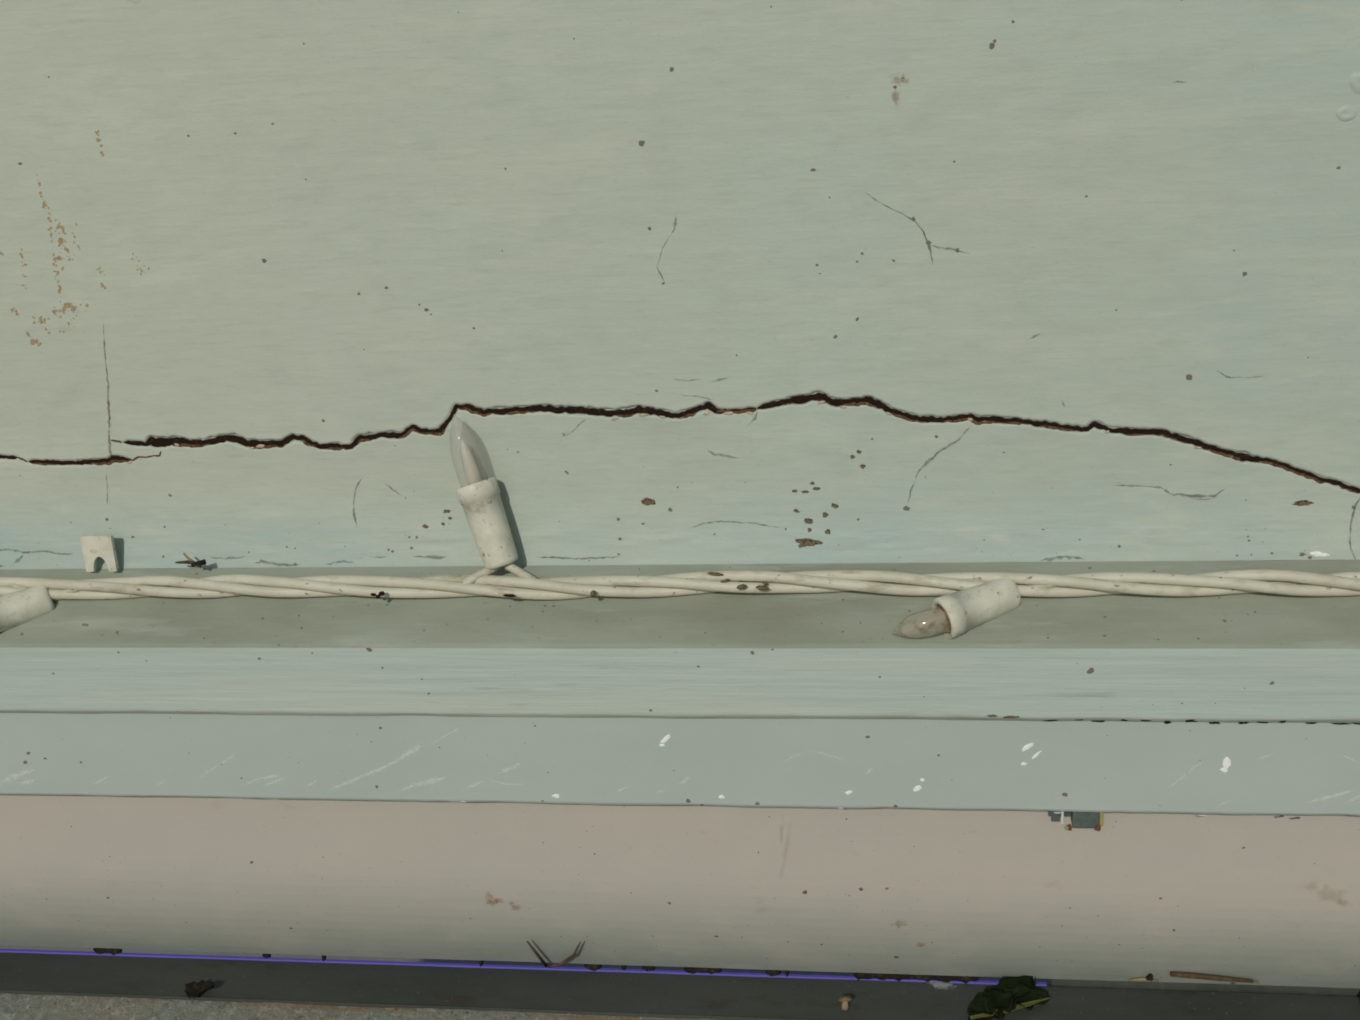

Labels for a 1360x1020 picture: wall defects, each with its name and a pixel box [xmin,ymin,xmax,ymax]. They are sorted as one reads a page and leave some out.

crack [0,327,1360,560]